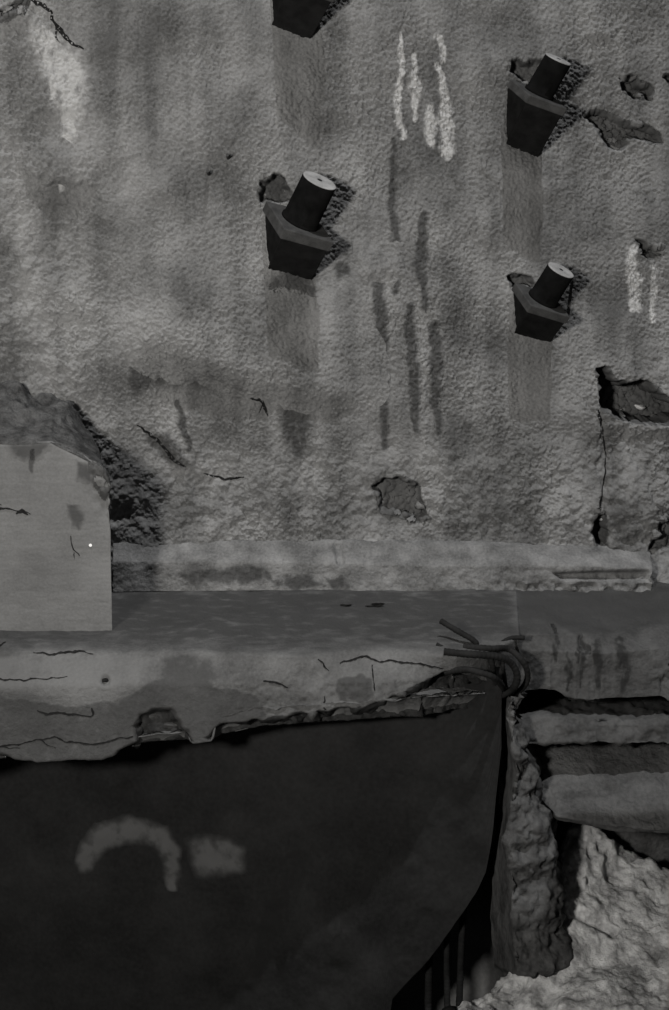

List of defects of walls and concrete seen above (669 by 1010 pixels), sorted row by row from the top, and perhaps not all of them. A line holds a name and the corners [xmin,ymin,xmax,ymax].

water stain [385,29,458,242]
spalling [583,110,663,150]
spalling [620,74,655,101]
water stain [623,239,659,325]
water stain [369,209,446,452]
spalling [596,367,669,426]
crack [597,410,606,509]
crack [0,650,93,682]
crack [318,655,444,691]
spalling [0,667,505,1010]